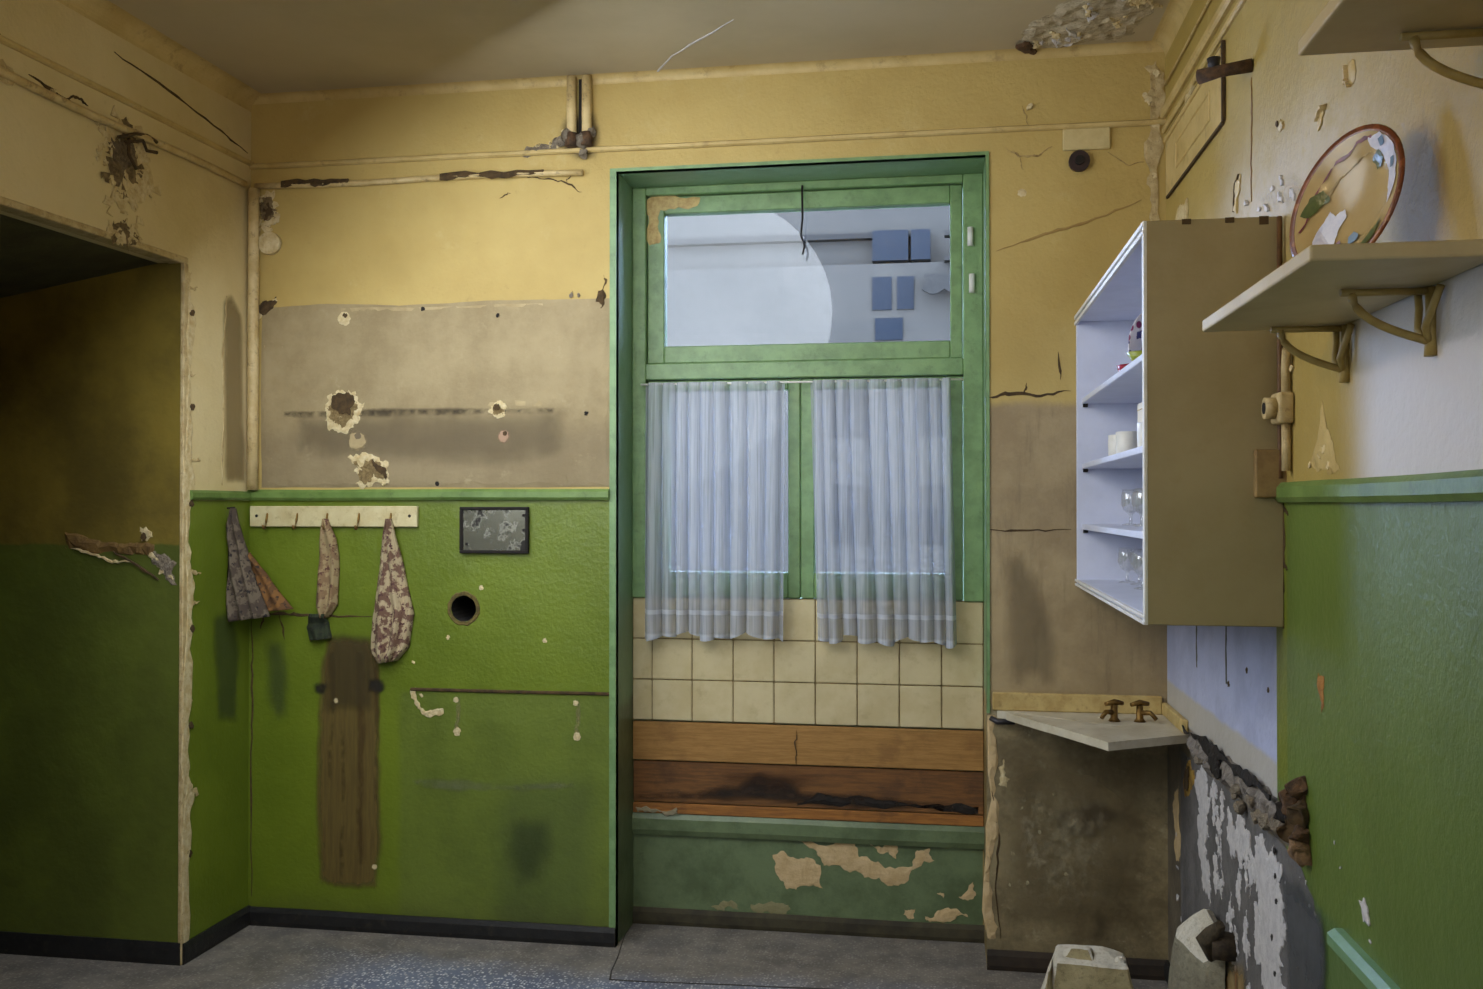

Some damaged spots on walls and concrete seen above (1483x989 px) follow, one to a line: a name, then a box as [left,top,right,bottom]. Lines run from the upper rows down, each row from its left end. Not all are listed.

peeling [1015,0,1163,55]
spalling [94,105,161,248]
crack [501,176,579,198]
peeling [1232,174,1296,214]
spalling [325,390,364,434]
spalling [348,452,390,489]
spalling [904,715,1030,939]
peeling [711,841,934,914]
peeling [1168,725,1323,989]
spalling [1041,944,1134,989]